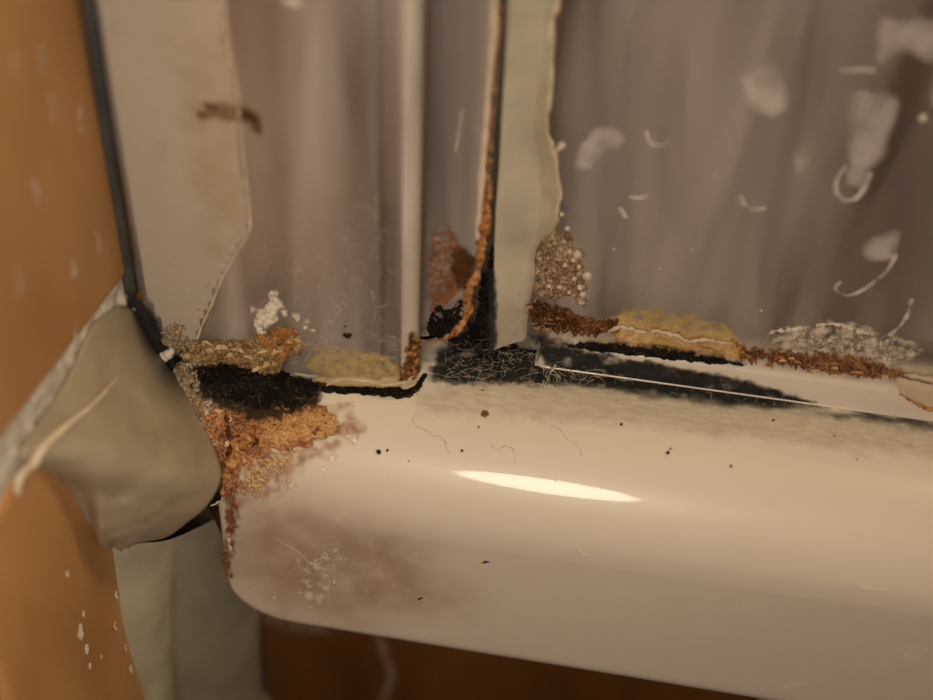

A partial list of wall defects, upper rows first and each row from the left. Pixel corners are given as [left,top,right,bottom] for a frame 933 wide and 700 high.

rust [398,0,506,382]
rust [173,326,356,579]
leakage [194,247,820,412]
rust [525,298,905,381]
leakage [835,411,933,428]